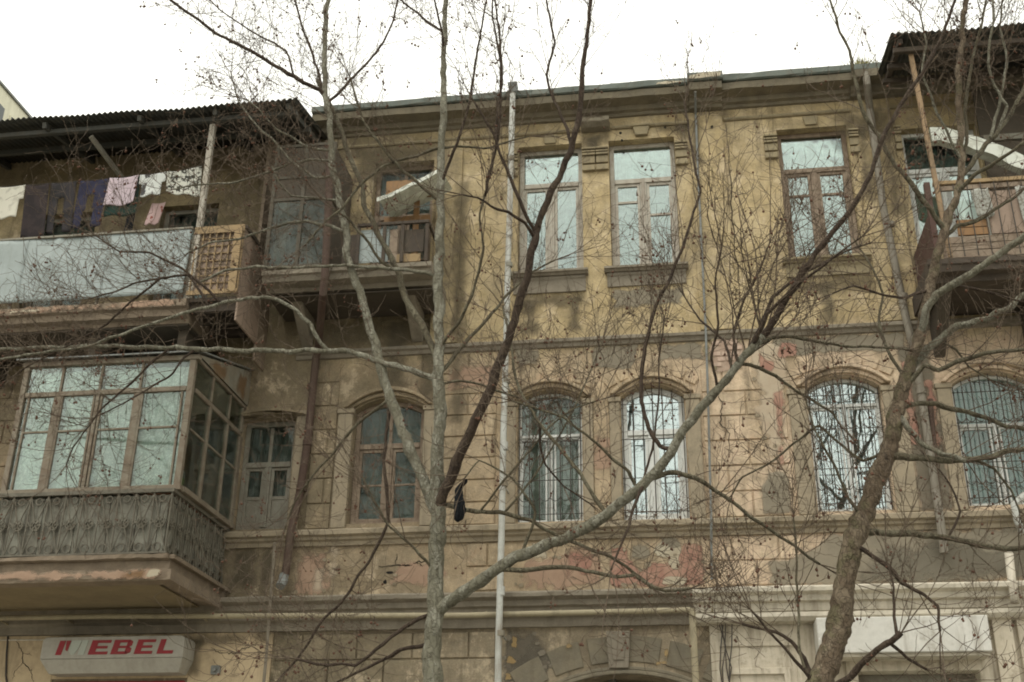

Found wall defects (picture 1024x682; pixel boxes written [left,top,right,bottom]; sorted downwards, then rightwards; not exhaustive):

peeling [702,339,797,465]
peeling [0,568,161,581]
peeling [514,537,707,590]